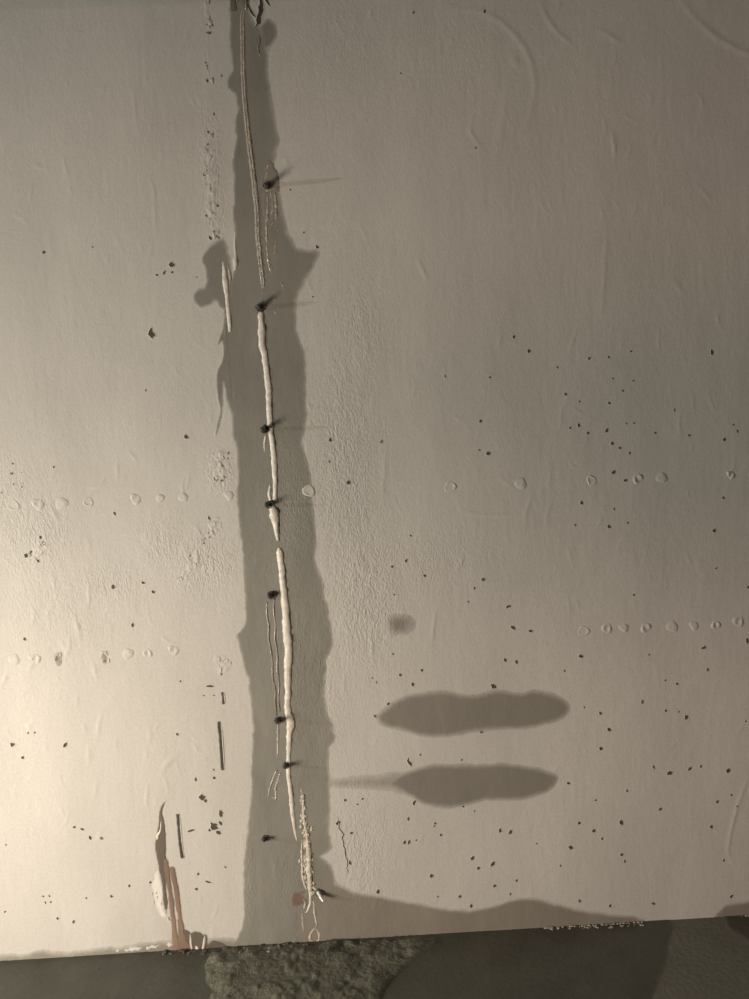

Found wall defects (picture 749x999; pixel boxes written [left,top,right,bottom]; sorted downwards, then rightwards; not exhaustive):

peeling [151,870,172,923]
crack [240,0,313,898]